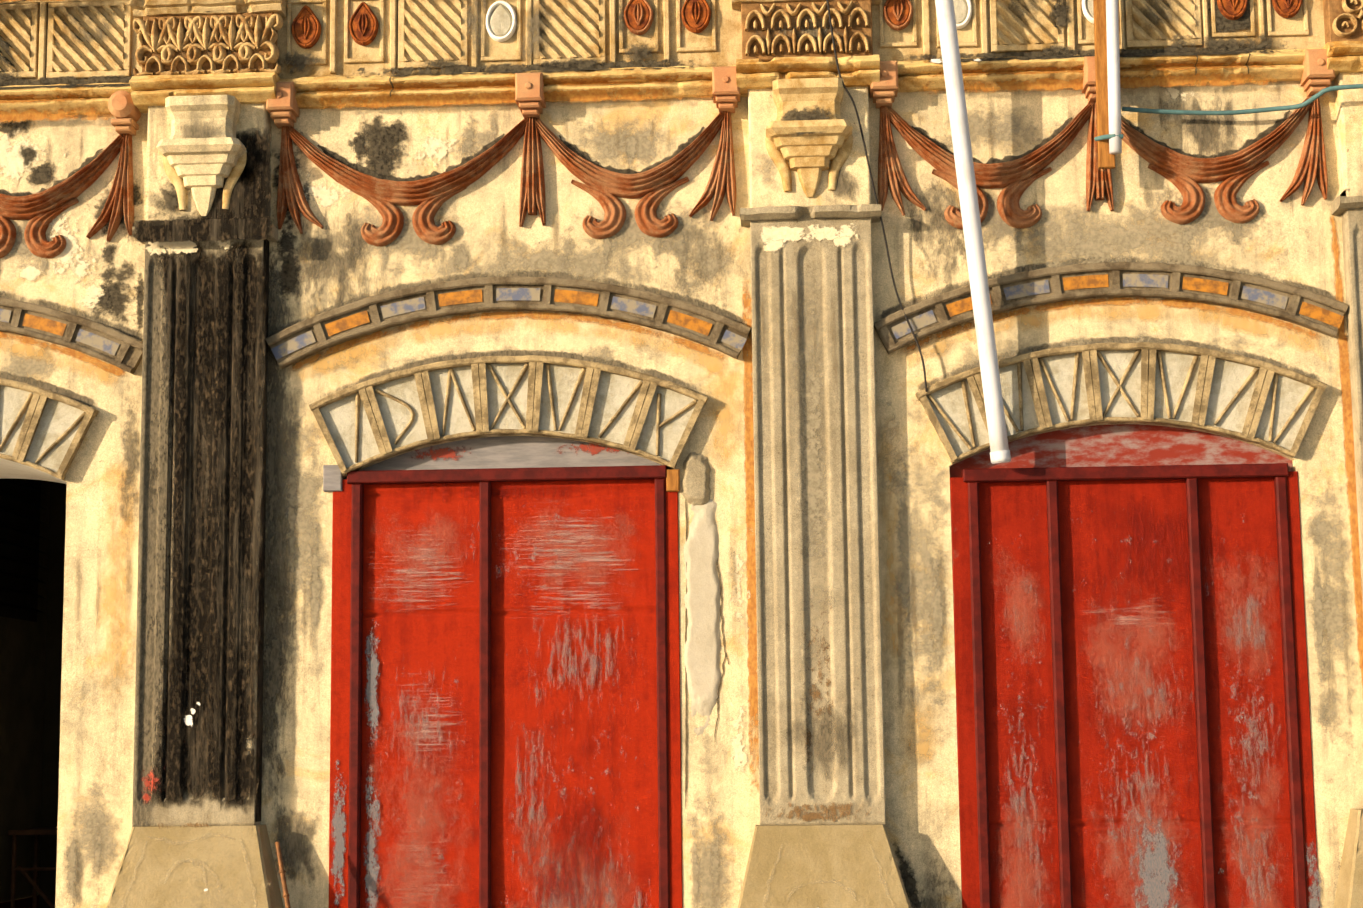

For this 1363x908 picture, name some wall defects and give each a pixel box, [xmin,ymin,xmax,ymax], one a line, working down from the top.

water stain [0,111,742,908]
flaking render [760,223,858,252]